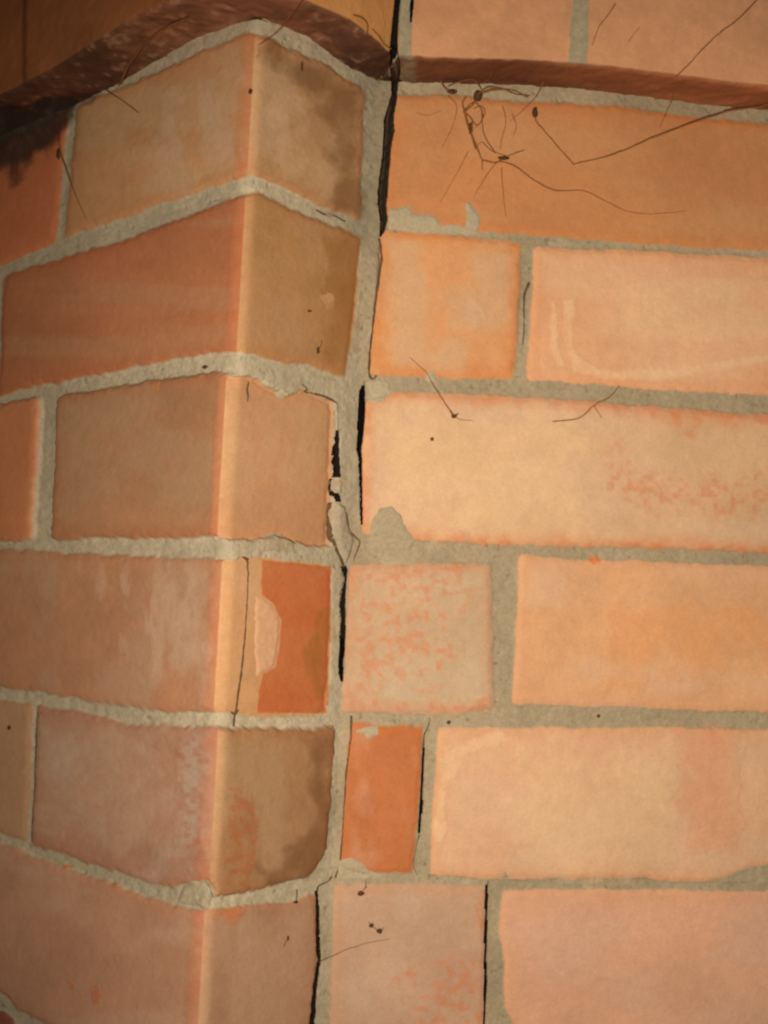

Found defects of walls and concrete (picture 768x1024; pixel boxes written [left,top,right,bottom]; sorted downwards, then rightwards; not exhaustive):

crack [301,0,414,682]
crack [231,556,249,727]
peeling [254,559,336,714]
crack [309,715,353,1024]
crack [413,718,431,874]
crack [482,881,490,1024]